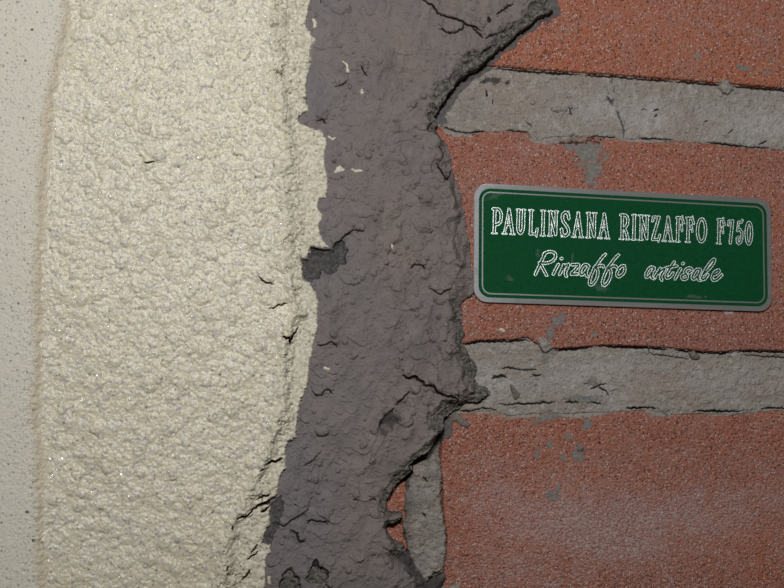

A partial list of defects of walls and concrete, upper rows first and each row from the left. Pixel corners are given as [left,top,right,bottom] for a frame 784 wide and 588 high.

spalling [427,0,553,135]
crack [422,0,784,141]
crack [705,129,769,149]
spalling [301,241,349,282]
crack [282,327,298,344]
crack [466,339,784,379]
crack [379,375,609,429]
spalling [377,301,488,555]
crack [260,457,283,472]
crack [231,494,328,543]
crack [226,544,258,579]
spalling [279,564,328,588]